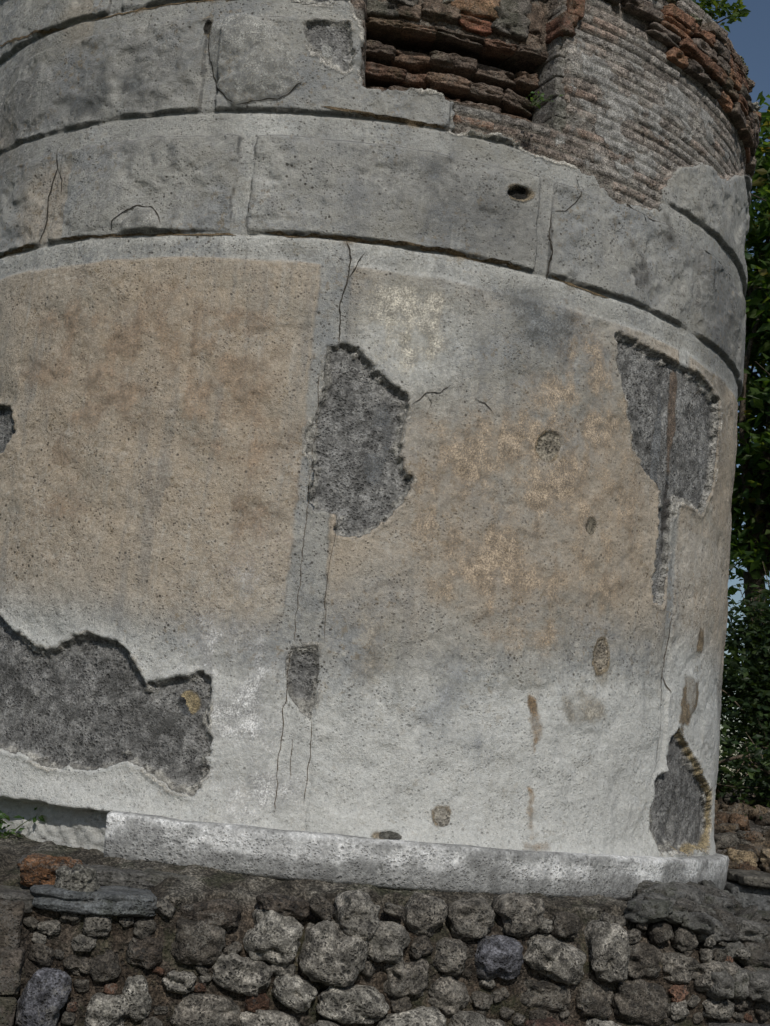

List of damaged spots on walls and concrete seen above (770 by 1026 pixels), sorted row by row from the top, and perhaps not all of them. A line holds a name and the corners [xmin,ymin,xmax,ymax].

crack [208,40,303,105]
flaking render [304,0,520,92]
flaking render [410,0,748,212]
crack [39,155,62,242]
crack [111,205,160,229]
crack [546,178,582,278]
crack [339,241,364,342]
flaking render [302,344,417,538]
flaking render [614,333,722,605]
flaking render [0,616,213,796]
flaking render [285,642,321,719]
flaking render [649,729,713,856]